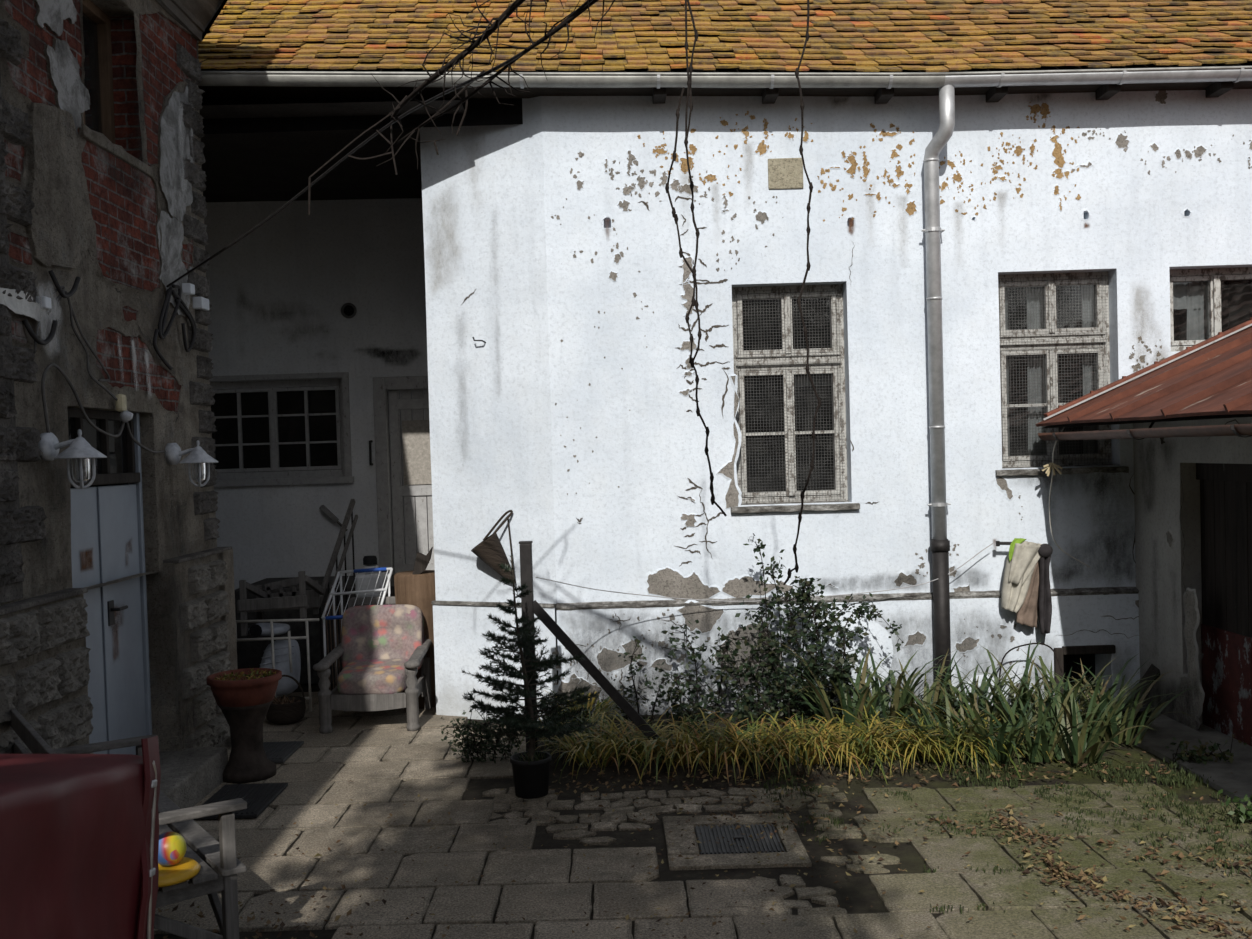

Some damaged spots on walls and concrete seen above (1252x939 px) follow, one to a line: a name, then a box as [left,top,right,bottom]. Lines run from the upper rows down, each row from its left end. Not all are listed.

peeling [573,111,813,282]
peeling [817,123,918,230]
peeling [939,100,1130,223]
peeling [1141,142,1222,175]
crack [640,196,729,416]
flaking render [716,374,742,509]
crack [676,478,723,566]
flaking render [892,549,928,588]
flaking render [552,566,795,709]
flaking render [901,628,928,649]